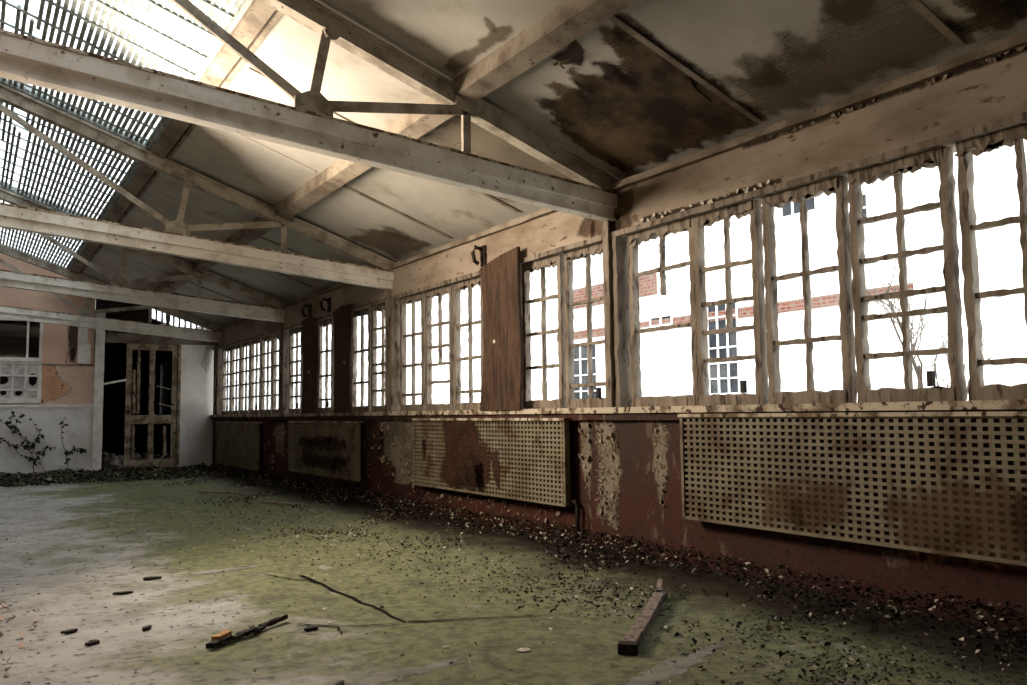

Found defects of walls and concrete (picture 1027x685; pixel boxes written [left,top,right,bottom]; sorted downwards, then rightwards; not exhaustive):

water stain [445,18,511,72]
water stain [536,0,1027,173]
peeling [41,364,71,404]